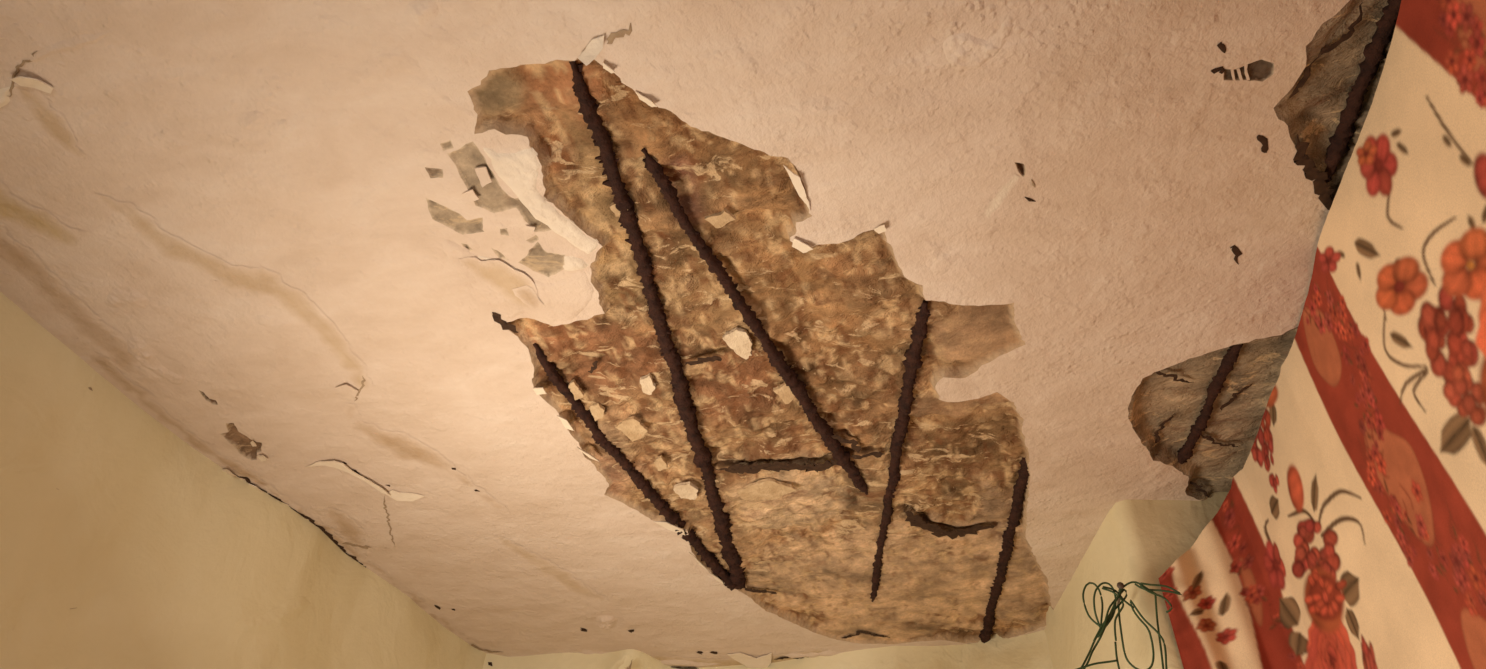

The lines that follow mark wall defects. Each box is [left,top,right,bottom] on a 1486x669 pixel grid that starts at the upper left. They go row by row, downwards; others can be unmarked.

crack [0,31,114,108]
spalling [1223,60,1274,82]
spalling [1274,0,1401,210]
spalling [425,23,1054,644]
spalling [1128,327,1298,501]
peeling [697,651,772,668]